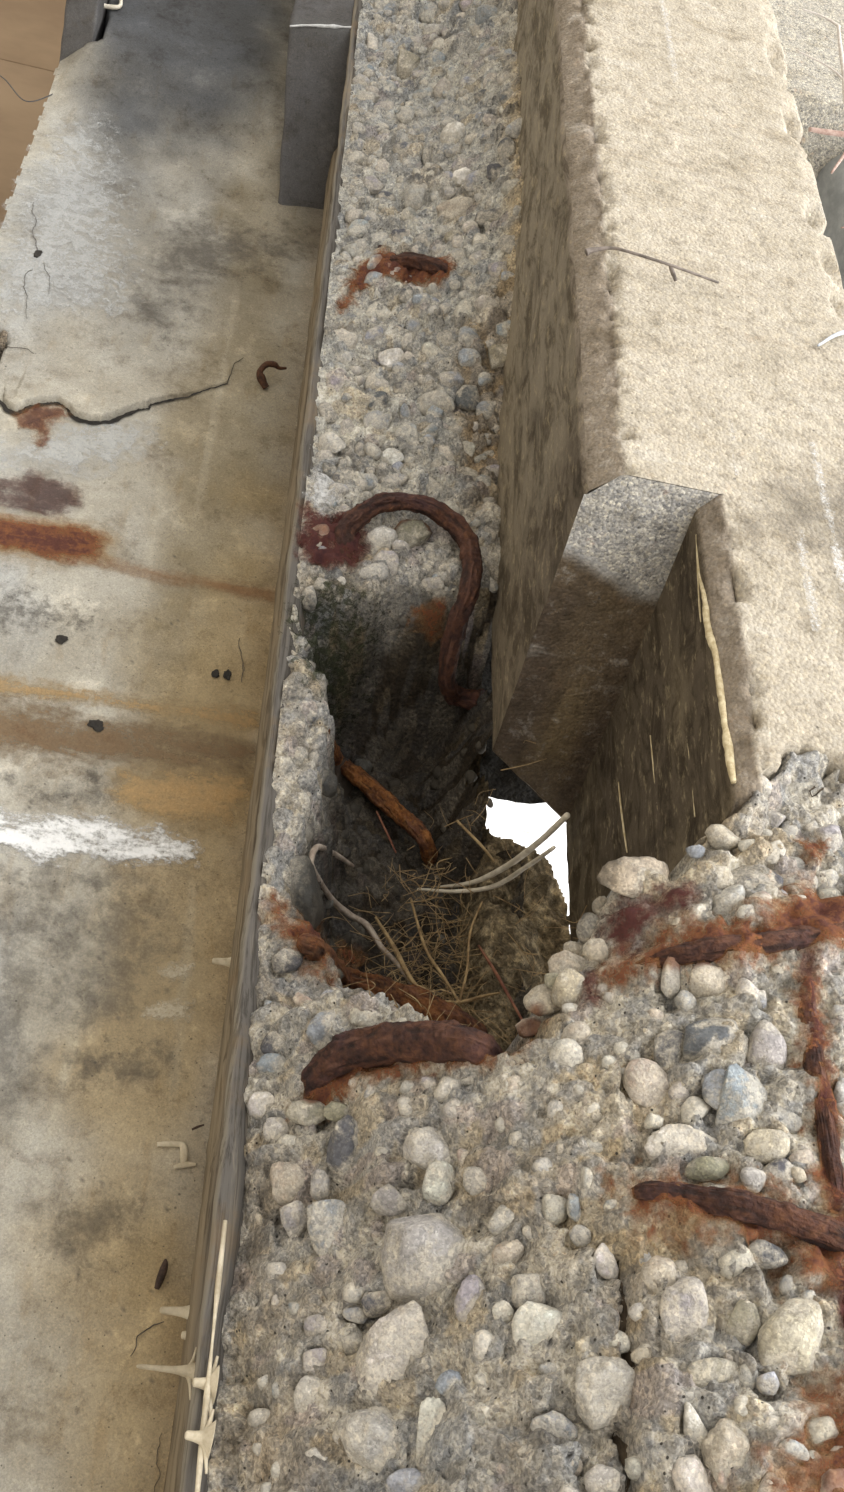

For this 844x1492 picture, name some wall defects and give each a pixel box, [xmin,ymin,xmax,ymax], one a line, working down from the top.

corrosion [336,248,457,314]
spalling [0,330,8,360]
corrosion [17,404,65,447]
crack [0,358,243,425]
corrosion [0,475,112,565]
corrosion [295,500,371,569]
spalling [207,0,844,1492]
corrosion [266,888,366,986]
corrosion [581,839,844,1223]
corrosion [308,1053,497,1124]
corrosion [606,1175,844,1318]
corrosion [756,1371,844,1492]